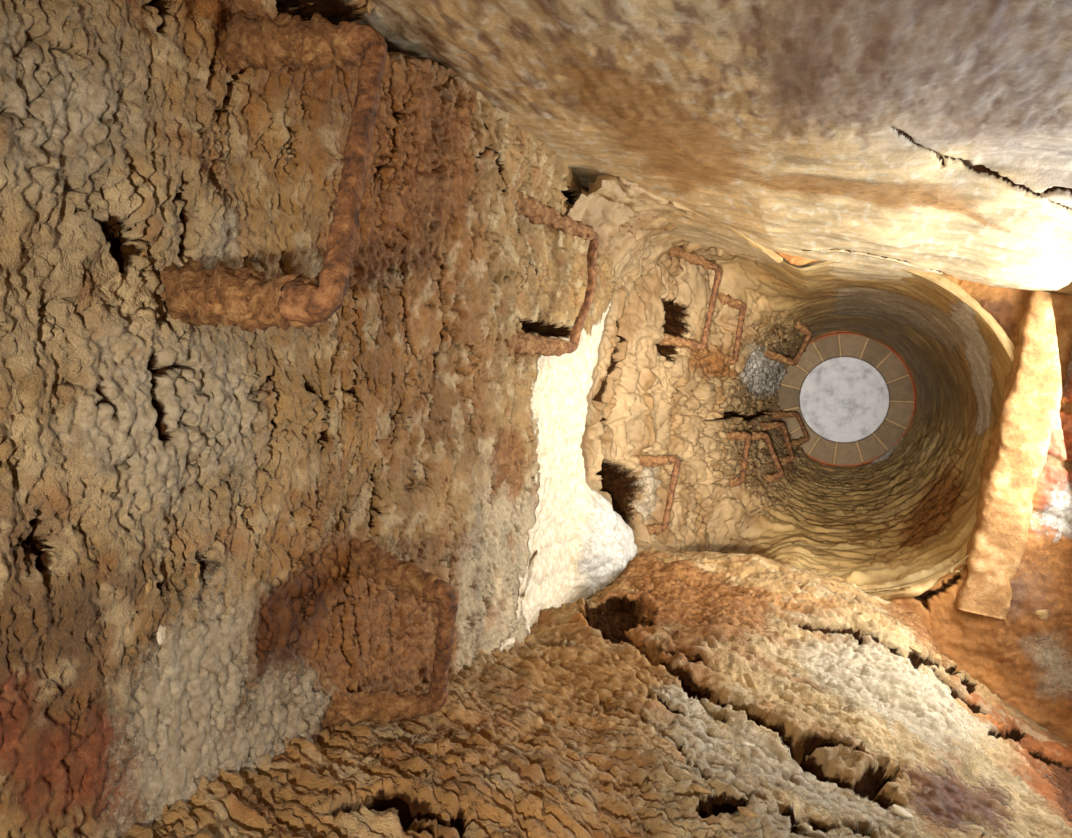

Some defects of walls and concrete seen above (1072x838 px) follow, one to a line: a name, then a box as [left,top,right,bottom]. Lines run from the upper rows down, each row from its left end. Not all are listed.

corrosion [259,52,359,111]
corrosion [353,65,477,286]
crack [892,126,1072,210]
corrosion [192,287,252,321]
corrosion [689,345,737,378]
efflorescence [1032,482,1072,542]
corrosion [253,534,438,716]
crack [798,623,1072,770]